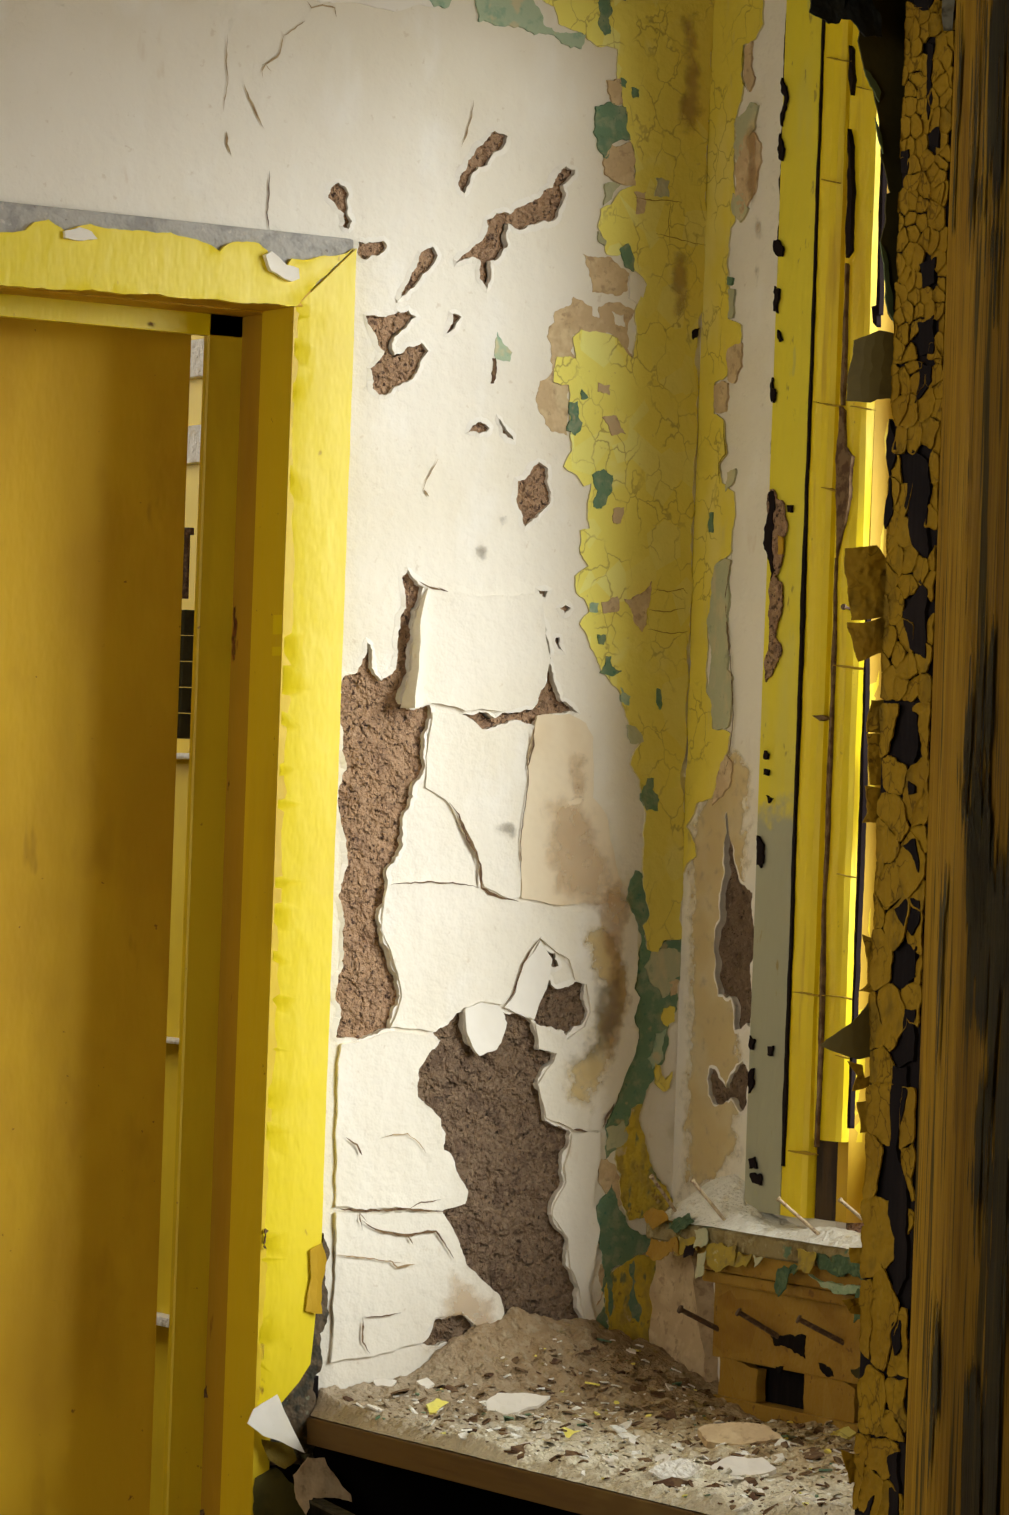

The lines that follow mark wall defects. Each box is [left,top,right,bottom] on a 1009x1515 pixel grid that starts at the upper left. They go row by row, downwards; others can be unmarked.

peeling [63,227,97,241]
peeling [263,251,300,282]
peeling [305,0,956,1515]
crack [391,731,535,901]
crack [505,940,539,1004]
crack [346,1133,426,1155]
crack [573,1104,614,1132]
crack [336,1200,454,1268]
crack [362,1313,398,1353]
peeling [247,1395,352,1515]